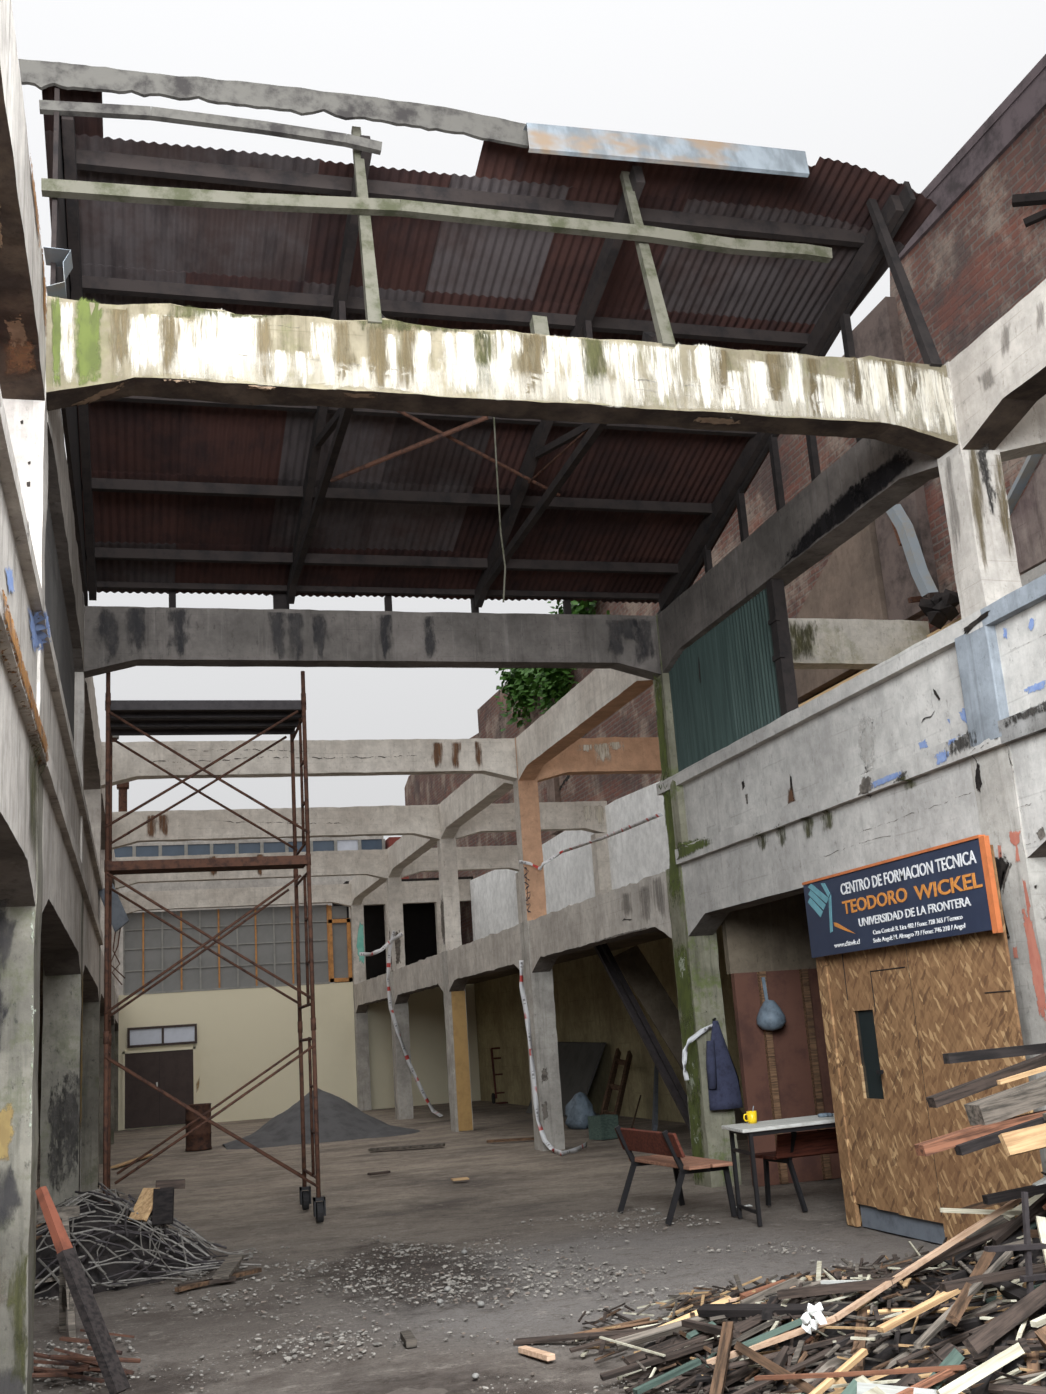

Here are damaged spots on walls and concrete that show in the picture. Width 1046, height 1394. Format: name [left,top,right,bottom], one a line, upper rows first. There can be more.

leakage [60,302,74,380]
leakage [112,308,958,434]
leakage [947,444,1012,567]
leakage [99,608,145,656]
leakage [168,609,186,654]
leakage [270,612,326,660]
spalling [964,611,990,634]
peeling [1024,681,1045,694]
peeling [919,689,967,765]
rust [434,741,482,767]
spalling [972,756,982,791]
peeling [995,827,1046,1023]